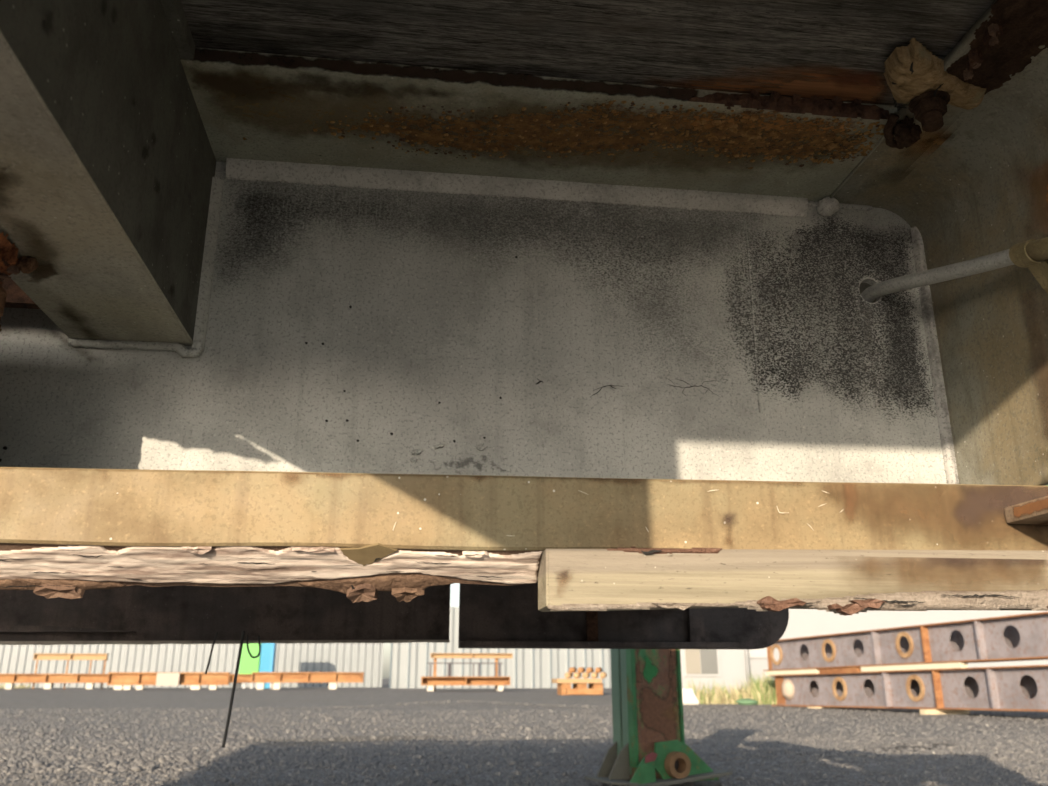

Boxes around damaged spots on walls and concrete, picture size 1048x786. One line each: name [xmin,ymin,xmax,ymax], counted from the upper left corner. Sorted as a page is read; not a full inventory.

rust [193,68,904,171]
water stain [225,185,937,425]
peeling [0,543,543,603]